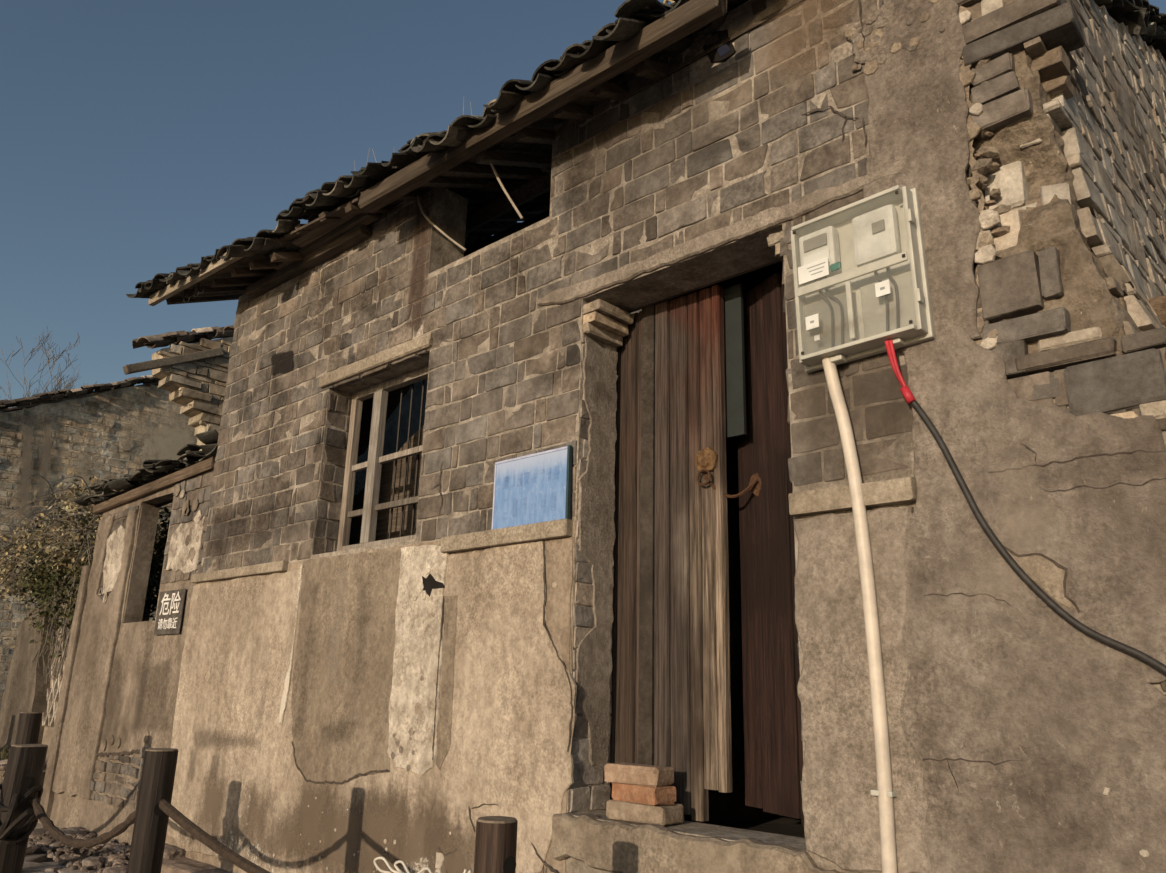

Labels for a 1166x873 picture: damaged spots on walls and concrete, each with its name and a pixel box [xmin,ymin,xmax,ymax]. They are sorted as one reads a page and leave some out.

spalling [845,0,1166,419]
crack [988,444,1166,492]
peeling [99,506,139,604]
flaking render [159,471,214,584]
peeling [291,545,458,785]
flaking render [90,729,151,810]
leakage [196,779,473,873]